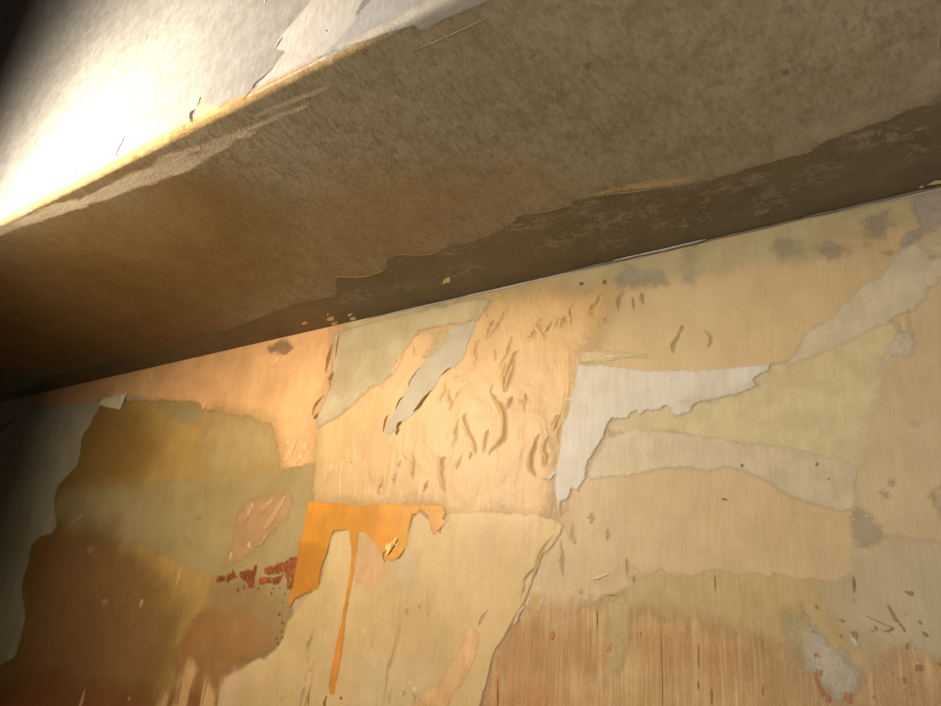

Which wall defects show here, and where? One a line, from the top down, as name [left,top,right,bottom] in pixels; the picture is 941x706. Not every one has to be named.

spalling [7,93,941,435]
water stain [359,190,941,325]